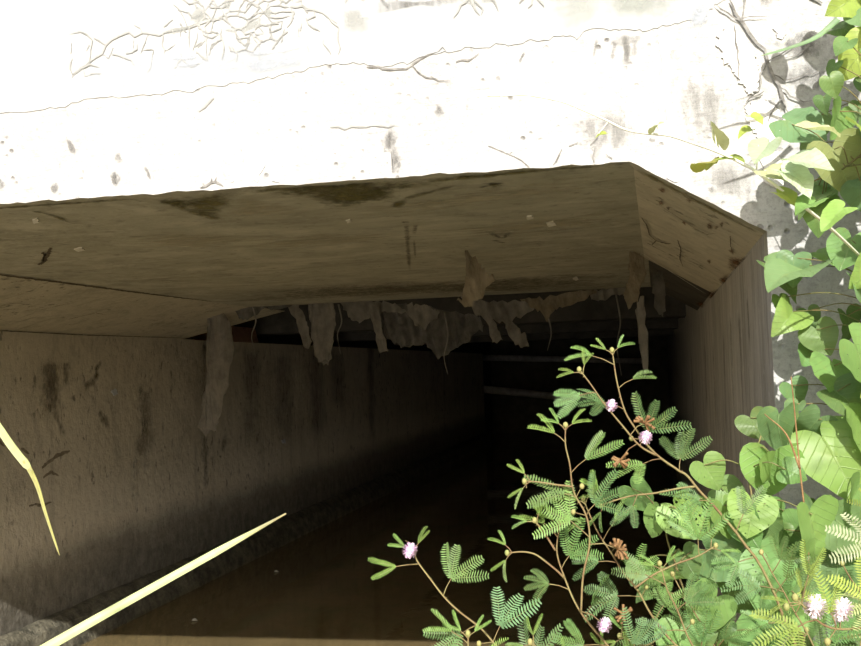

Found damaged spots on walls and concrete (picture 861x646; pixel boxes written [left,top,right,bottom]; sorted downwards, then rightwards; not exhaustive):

crack [68,0,341,78]
spalling [715,23,787,188]
peeling [665,155,679,182]
crack [0,248,206,337]
crack [642,208,732,293]